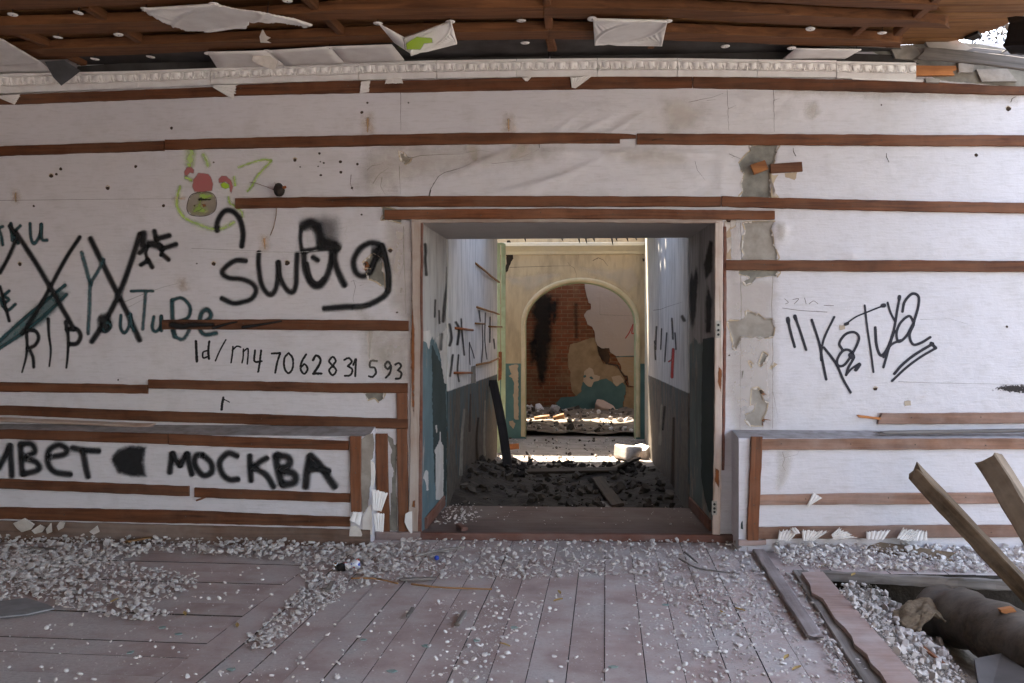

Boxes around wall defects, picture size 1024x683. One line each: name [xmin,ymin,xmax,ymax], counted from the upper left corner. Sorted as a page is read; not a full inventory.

flaking render [738,145,797,198]
flaking render [724,220,781,286]
spalling [597,346,610,363]
flaking render [726,310,777,370]
peeling [411,306,447,500]
flaking render [745,386,769,427]
peeling [361,433,376,535]